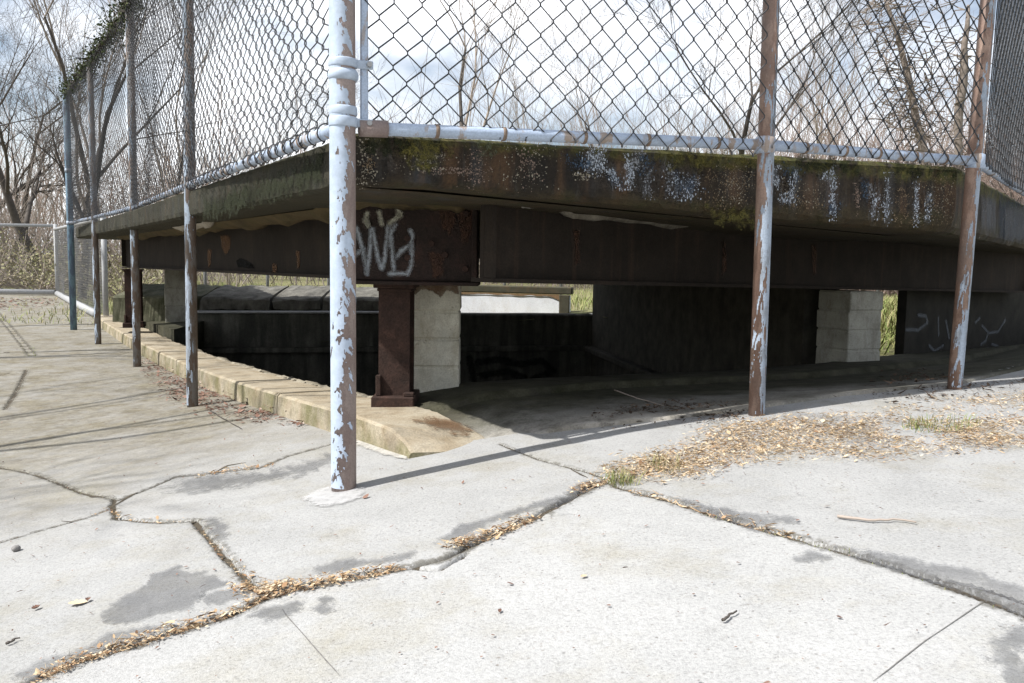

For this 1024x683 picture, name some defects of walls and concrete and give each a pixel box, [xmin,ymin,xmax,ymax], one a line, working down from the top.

peeling [117,0,407,489]
water stain [357,138,381,189]
water stain [400,142,563,193]
crack [0,445,339,683]
crack [323,445,1024,681]